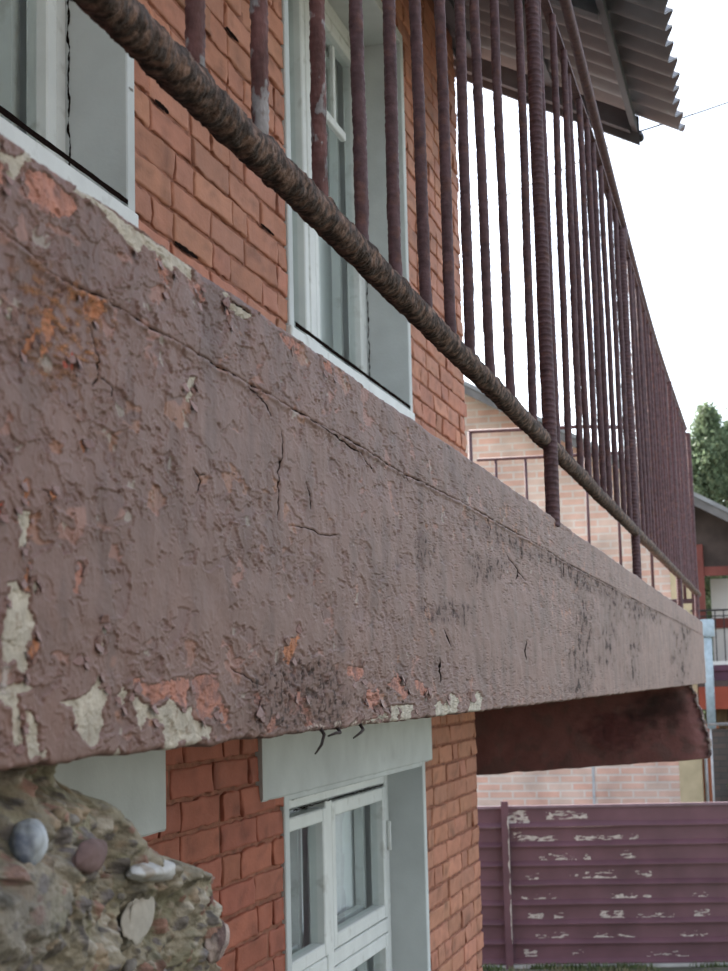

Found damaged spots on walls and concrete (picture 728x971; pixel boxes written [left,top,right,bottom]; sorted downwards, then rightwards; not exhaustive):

peeling [0,140,206,312]
peeling [20,296,55,364]
peeling [78,290,106,330]
peeling [222,292,252,332]
crack [51,273,452,536]
peeling [0,479,47,759]
peeling [61,614,229,750]
spalling [290,660,483,755]
peeling [507,810,558,944]
peeling [546,811,588,820]
peeling [574,835,639,858]
peeling [600,910,625,918]